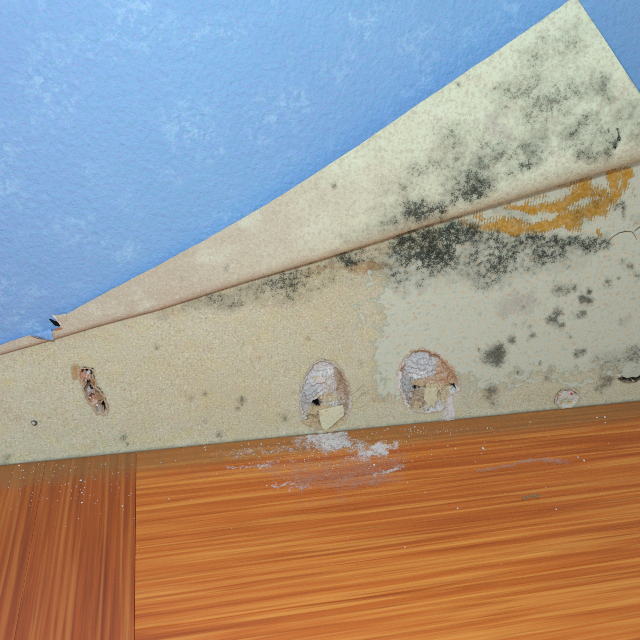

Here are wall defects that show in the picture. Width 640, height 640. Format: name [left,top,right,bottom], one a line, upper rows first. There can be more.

water stain [504,75,580,125]
water stain [561,111,621,165]
peeling [0,0,640,416]
water stain [255,134,634,304]
water stain [478,337,516,368]
flaking render [299,359,353,433]
water stain [443,390,458,421]